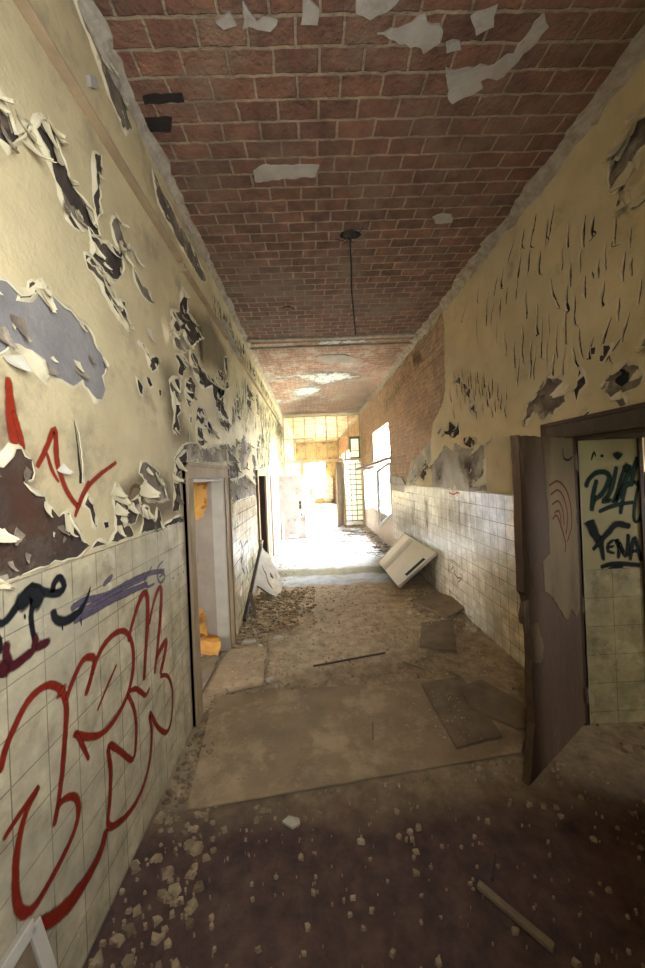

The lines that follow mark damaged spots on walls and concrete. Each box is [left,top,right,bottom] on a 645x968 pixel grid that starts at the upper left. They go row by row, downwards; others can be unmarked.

peeling [600,101,645,213]
peeling [0,89,263,590]
water stain [212,296,360,552]
peeling [521,365,590,428]
peeling [590,336,645,407]